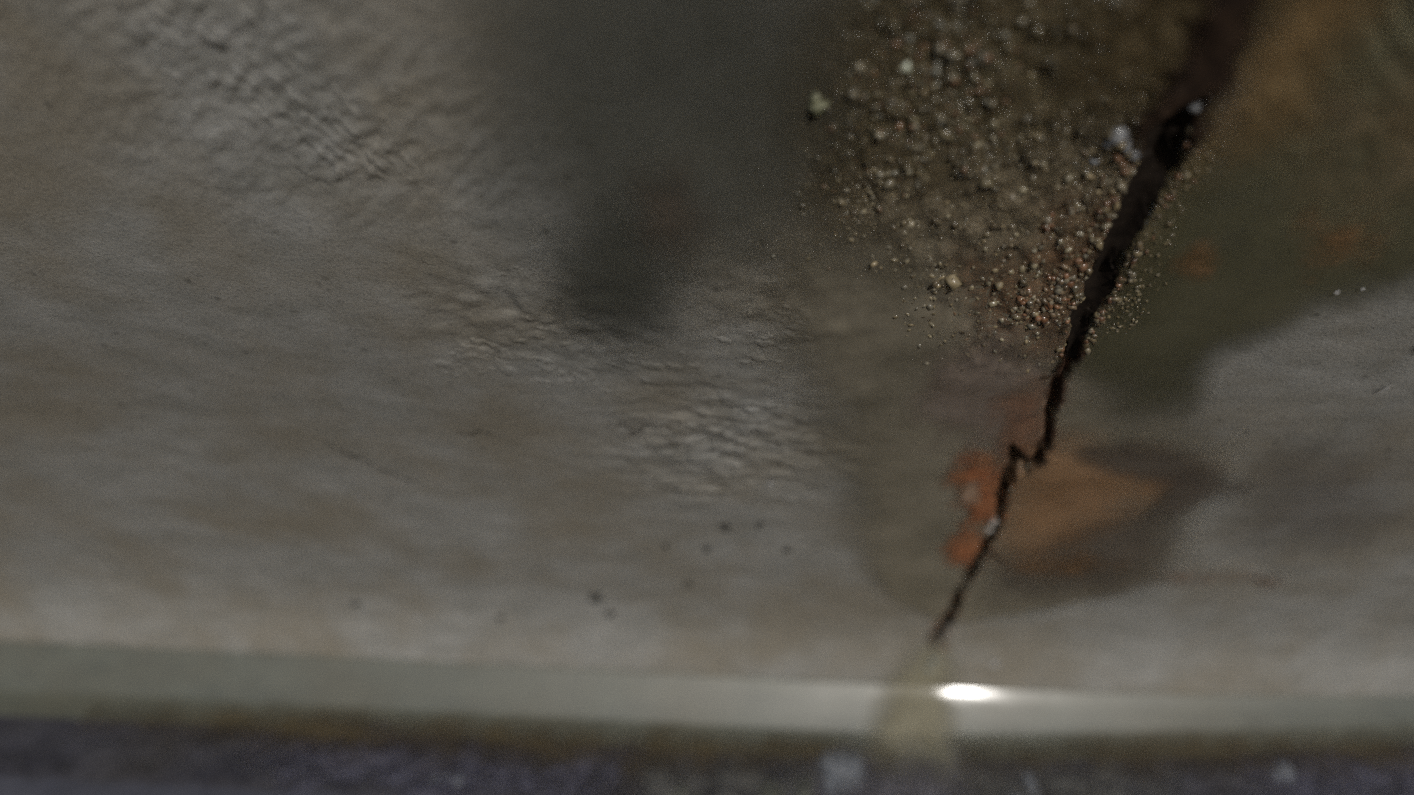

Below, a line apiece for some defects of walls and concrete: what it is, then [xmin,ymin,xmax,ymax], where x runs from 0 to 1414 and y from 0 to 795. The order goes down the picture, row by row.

spalling [754,0,1167,379]
corrosion [948,395,1044,563]
crack [925,0,1258,650]